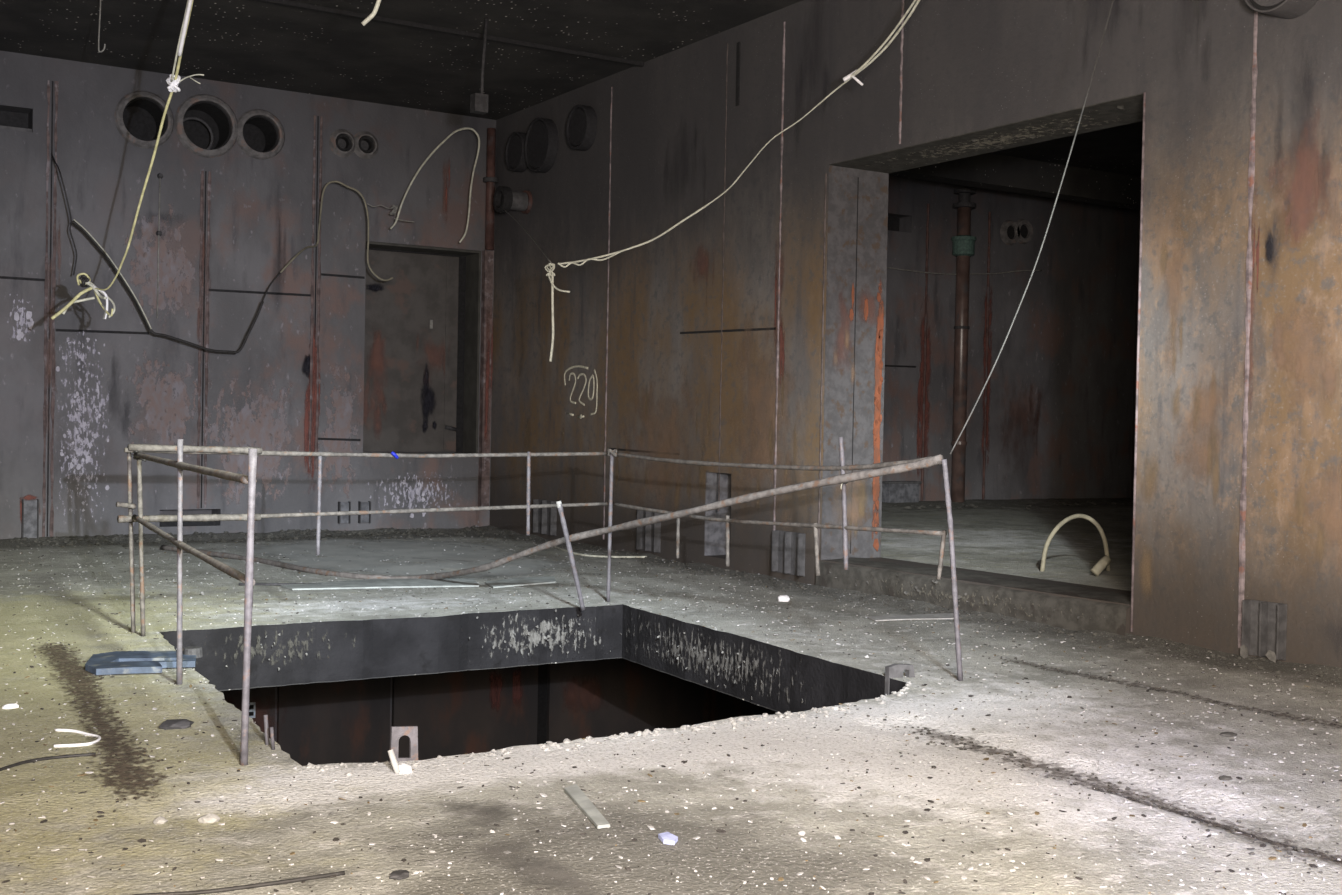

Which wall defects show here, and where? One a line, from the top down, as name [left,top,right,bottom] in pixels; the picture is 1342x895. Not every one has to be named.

peeling [7,294,35,344]
peeling [56,331,109,523]
corrosion [917,320,931,474]
corrosion [982,289,992,452]
corrosion [1249,227,1259,368]